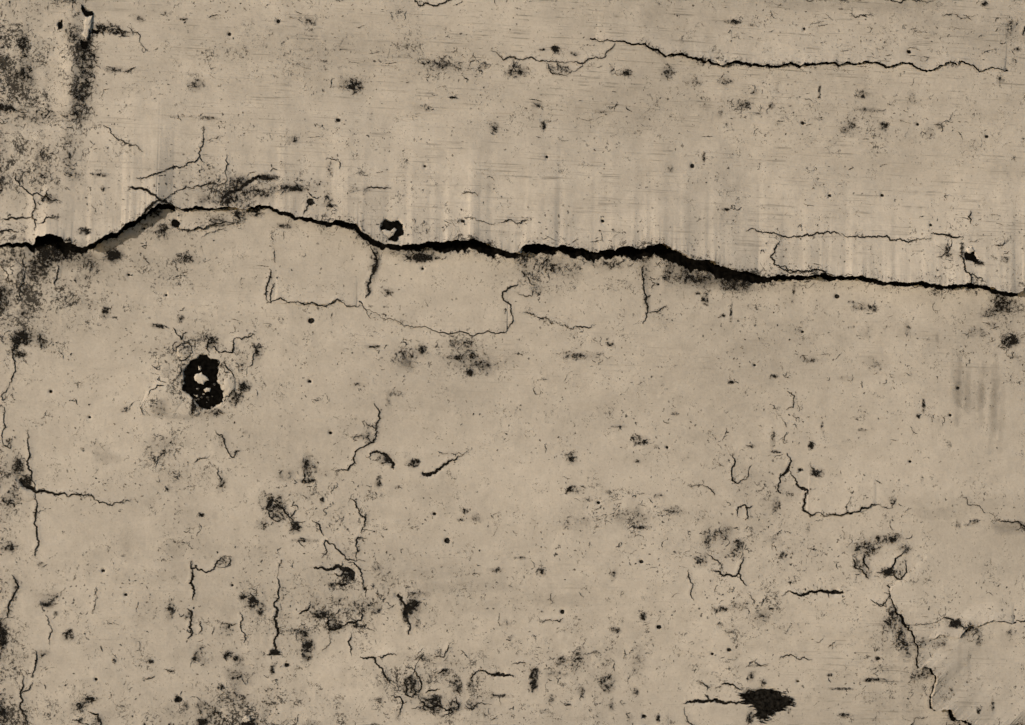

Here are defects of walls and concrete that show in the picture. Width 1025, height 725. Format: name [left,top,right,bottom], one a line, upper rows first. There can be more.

crack [0,0,157,166]
peeling [82,16,92,40]
peeling [594,0,1007,71]
peeling [0,79,1025,293]
peeling [194,366,211,392]
crack [0,114,1025,642]
crack [0,615,75,725]
crack [74,563,174,725]
crack [219,404,624,725]
crack [600,371,972,725]
peeling [889,541,1025,725]